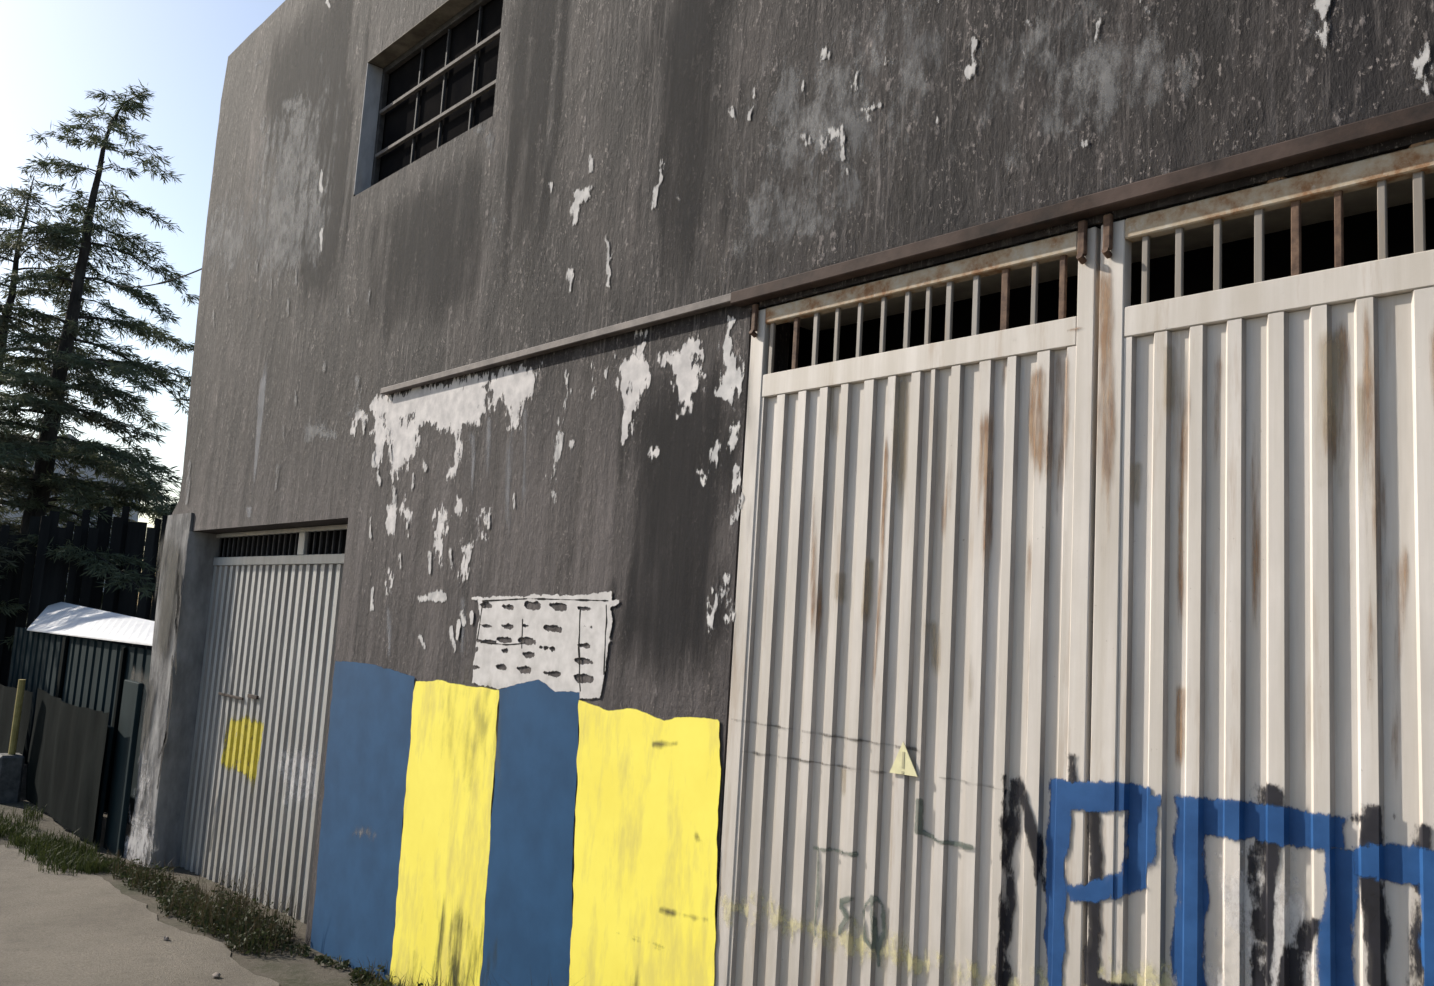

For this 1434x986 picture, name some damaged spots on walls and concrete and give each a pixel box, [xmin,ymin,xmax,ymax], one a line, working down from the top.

damp [206,0,352,286]
damp [155,542,182,653]
damp [254,372,266,475]
peeling [306,361,543,539]
peeling [418,496,491,603]
peeling [591,315,745,446]
peeling [696,421,744,525]
corrosion [979,419,993,554]
corrosion [1098,277,1113,476]
corrosion [1323,327,1347,456]
corrosion [1358,323,1371,432]
damp [131,668,153,756]